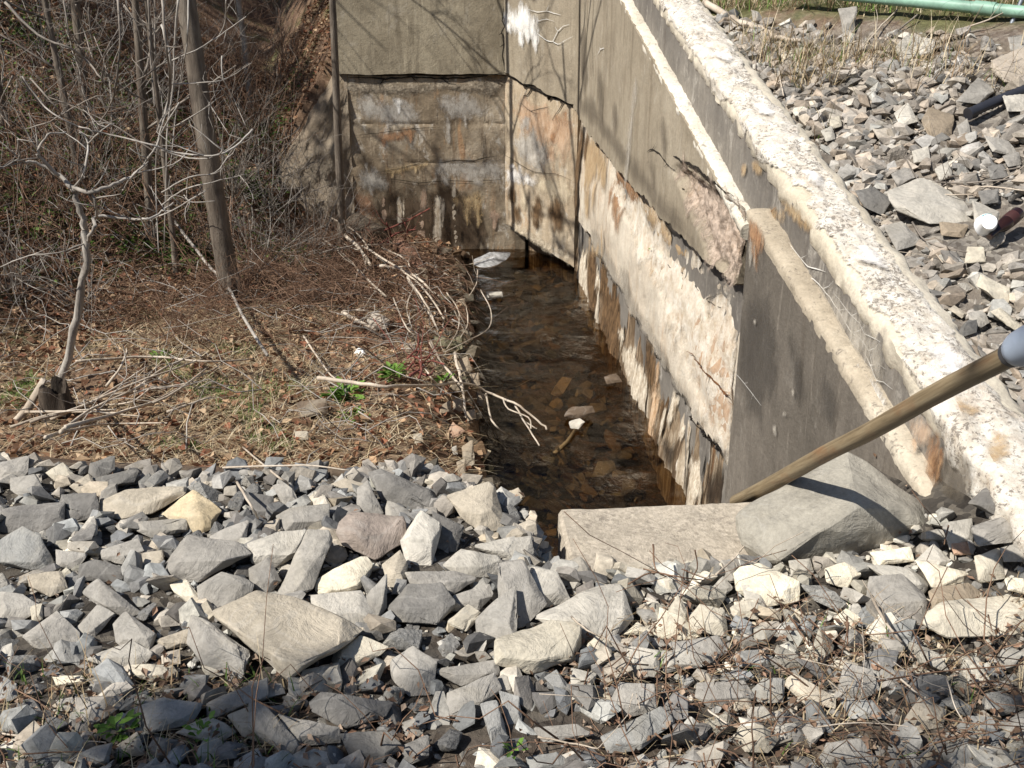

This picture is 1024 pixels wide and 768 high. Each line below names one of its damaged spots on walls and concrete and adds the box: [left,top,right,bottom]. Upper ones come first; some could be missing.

crack [348,8,573,120]
leakage [358,97,418,131]
leakage [361,161,502,249]
leakage [442,93,482,143]
leakage [515,118,550,169]
leakage [508,126,588,231]
rust [584,141,686,257]
crack [648,143,733,196]
rust [692,319,732,431]